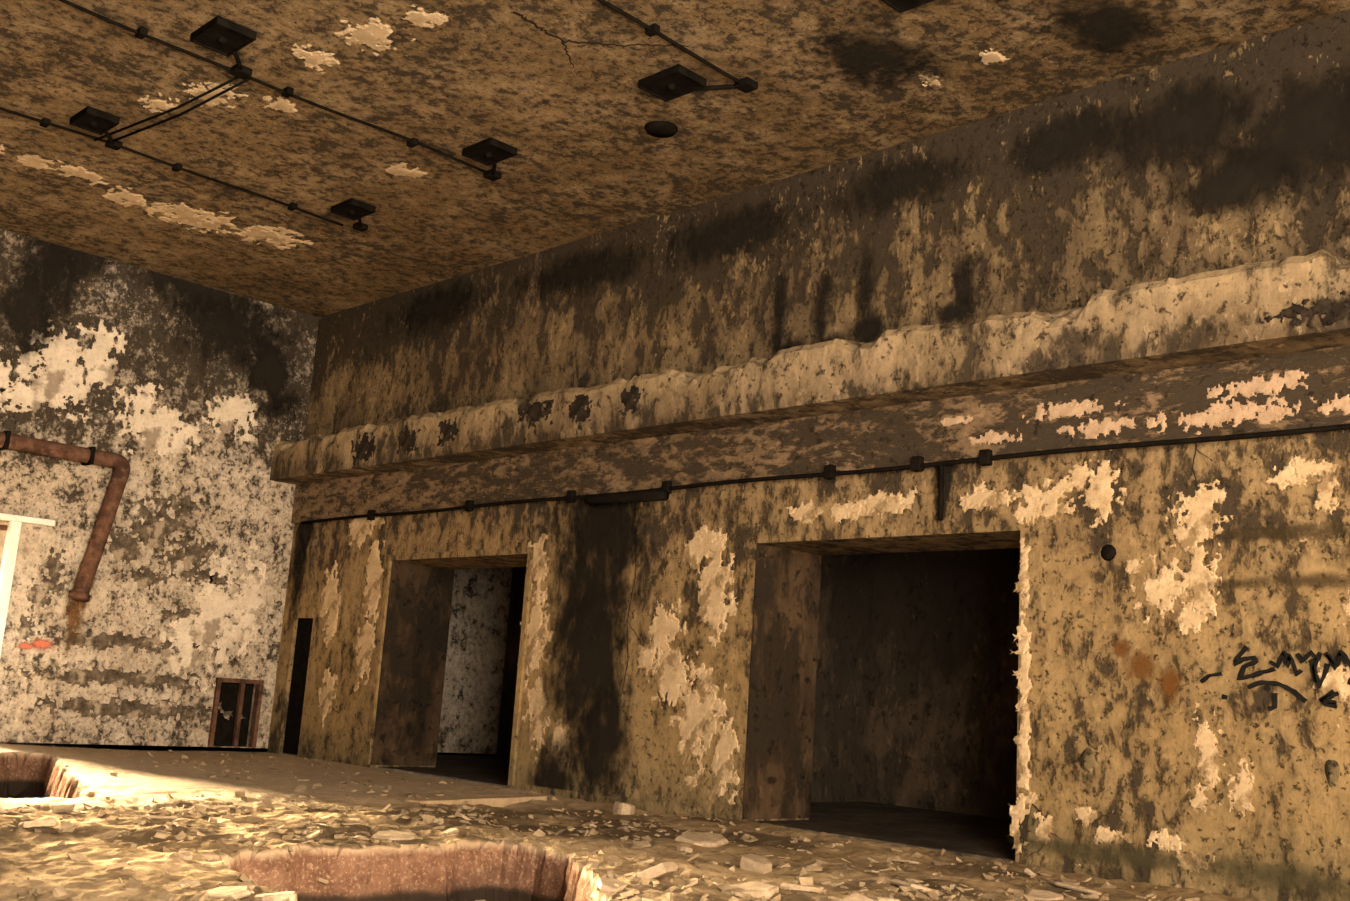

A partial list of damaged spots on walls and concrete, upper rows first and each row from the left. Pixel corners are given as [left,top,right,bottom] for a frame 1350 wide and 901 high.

peeling [290,5,449,74]
peeling [0,144,313,250]
damp [1123,74,1350,216]
damp [1,266,49,355]
damp [772,257,884,353]
damp [940,254,973,323]
peeling [0,319,258,459]
corrosion [67,600,86,632]
peeling [102,529,268,724]
damp [534,508,641,796]
peeling [637,525,741,805]
peeling [1310,661,1350,728]